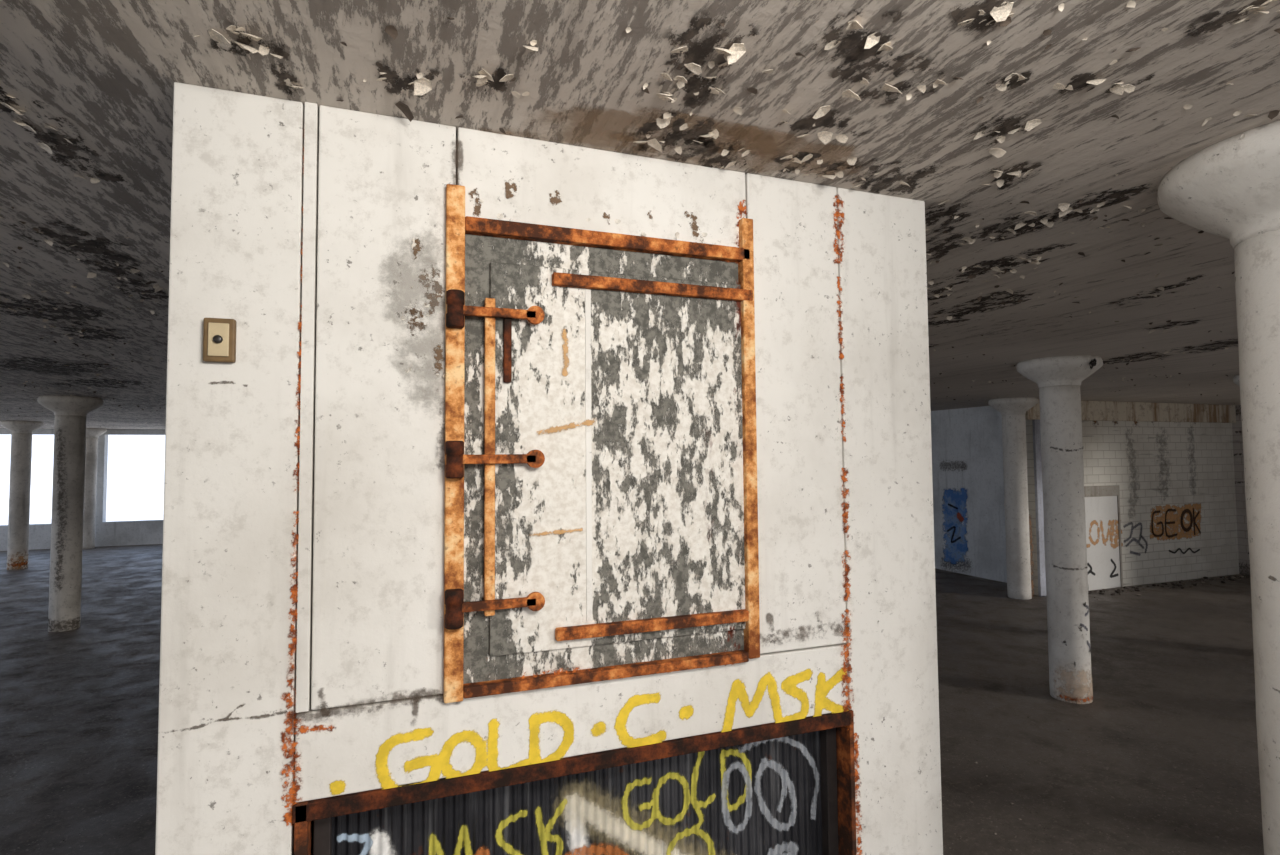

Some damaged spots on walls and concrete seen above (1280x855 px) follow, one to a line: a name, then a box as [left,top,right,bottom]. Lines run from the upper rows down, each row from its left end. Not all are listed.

peeling [1184,0,1280,37]
peeling [1053,47,1155,95]
rust [452,141,463,185]
peeling [469,188,484,217]
peeling [505,179,517,199]
peeling [675,211,716,245]
peeling [925,102,1163,327]
rust [833,195,844,359]
rust [293,305,302,491]
rust [537,419,595,434]
rust [841,467,854,712]
rust [281,511,336,826]